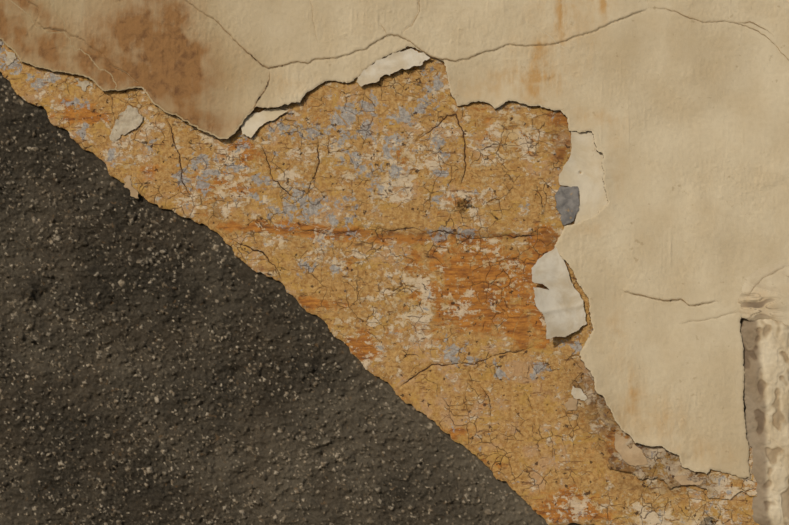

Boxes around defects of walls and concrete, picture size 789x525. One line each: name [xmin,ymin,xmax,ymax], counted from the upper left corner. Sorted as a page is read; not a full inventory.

crack [185,0,575,112]
peeling [357,48,430,87]
crack [659,8,789,60]
peeling [0,39,262,232]
crack [167,120,190,199]
crack [261,131,320,197]
crack [421,113,466,182]
crack [223,233,280,277]
crack [297,227,536,239]
peeling [217,56,759,525]
crack [624,291,723,322]